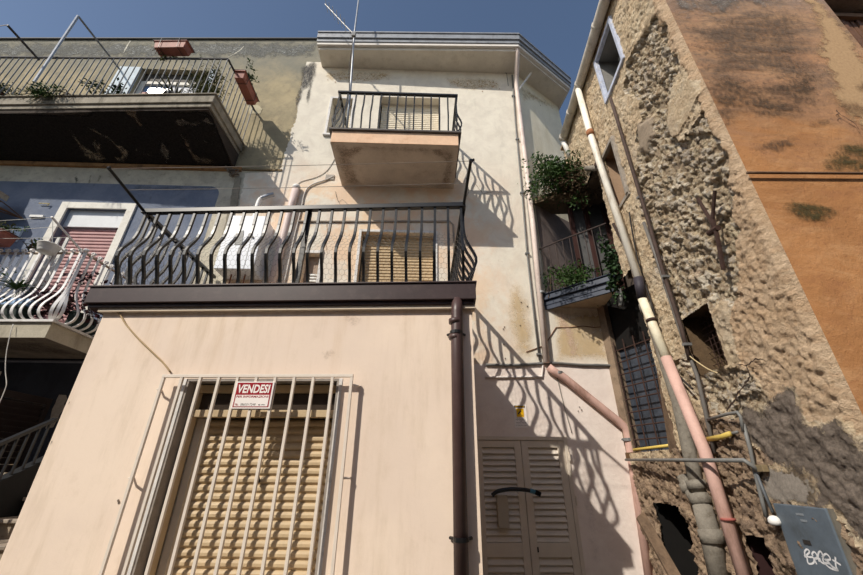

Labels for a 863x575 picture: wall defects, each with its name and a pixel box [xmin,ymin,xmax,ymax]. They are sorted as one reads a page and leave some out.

water stain [700,16,814,117]
water stain [0,109,231,167]
spalling [623,16,741,324]
water stain [825,145,863,170]
water stain [788,203,836,220]
crack [726,358,765,412]